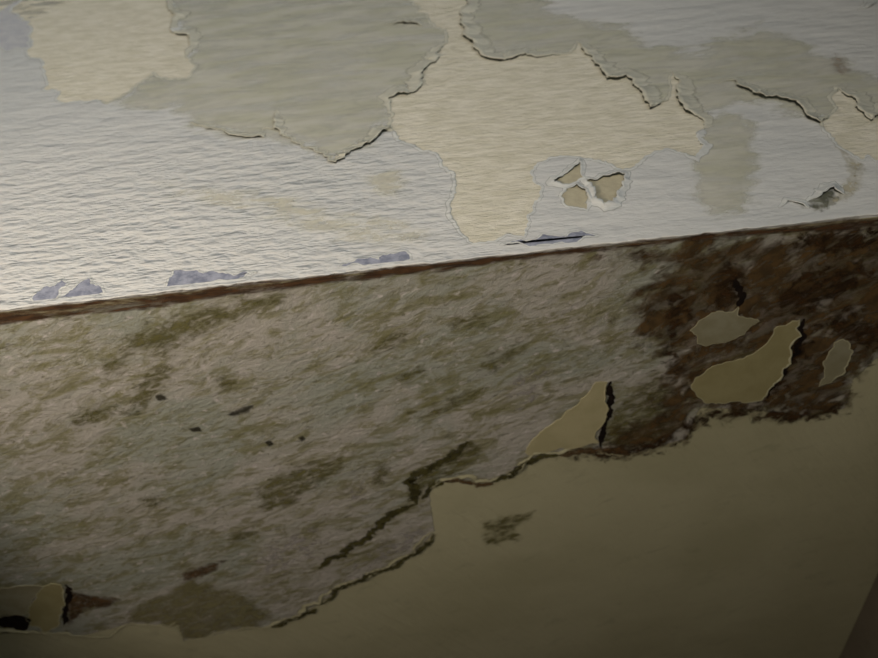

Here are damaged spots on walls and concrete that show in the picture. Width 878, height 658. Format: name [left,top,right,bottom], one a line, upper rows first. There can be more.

peeling [0,0,202,104]
peeling [190,0,714,247]
peeling [714,78,878,162]
peeling [778,181,845,208]
damp [104,296,280,369]
damp [574,220,878,461]
damp [136,365,172,414]
peeling [0,222,878,642]
damp [257,458,341,509]
damp [484,515,530,544]
damp [131,580,266,638]